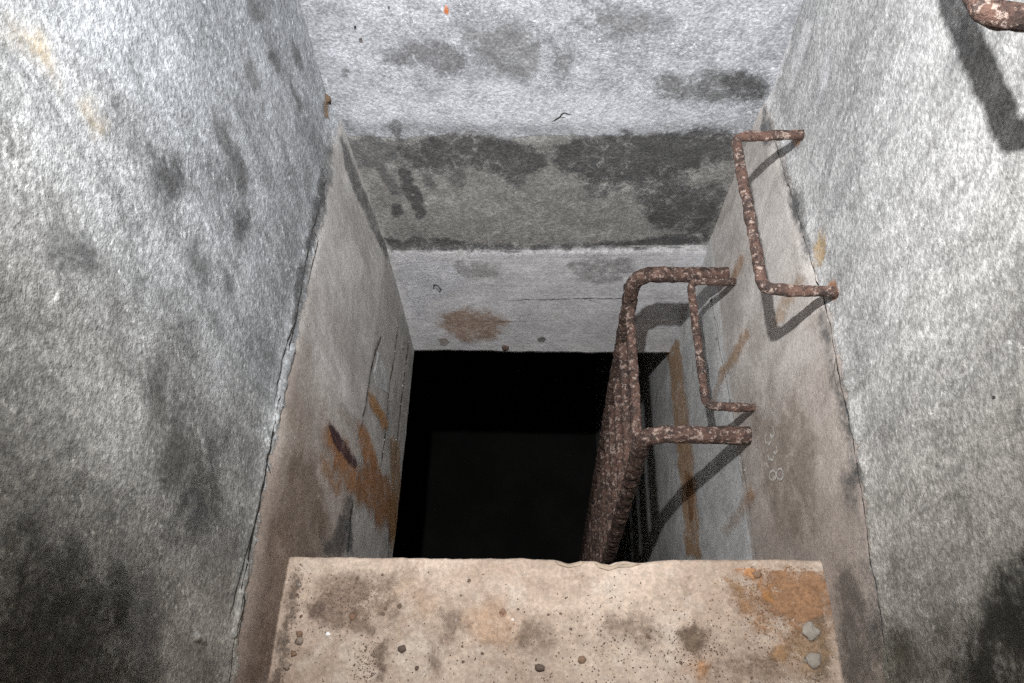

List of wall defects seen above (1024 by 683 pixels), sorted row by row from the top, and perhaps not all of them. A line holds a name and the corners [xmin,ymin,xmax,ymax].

damp [127,131,180,195]
damp [213,112,250,237]
damp [292,22,812,322]
rust [442,311,505,341]
rust [666,340,689,426]
rust [712,331,749,402]
damp [152,379,221,513]
rust [326,393,401,543]
rust [677,443,701,559]
damp [0,526,155,683]
rust [726,568,832,673]
damp [953,556,1024,683]